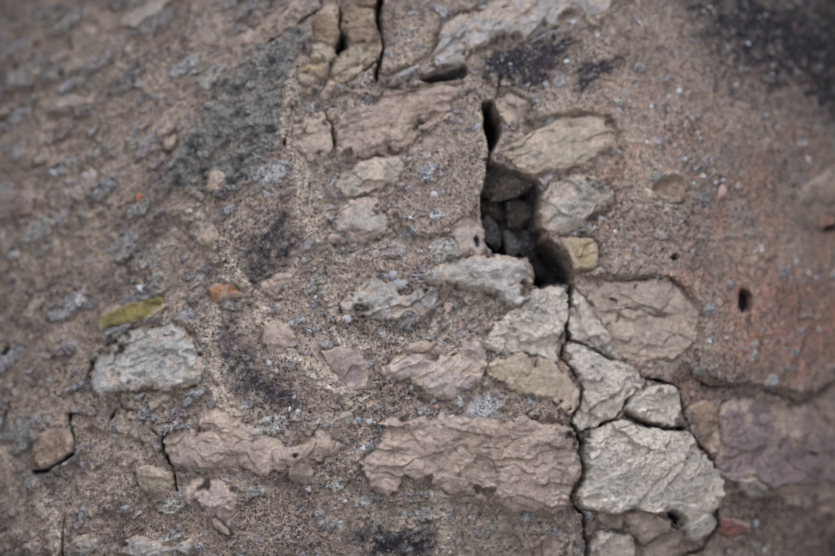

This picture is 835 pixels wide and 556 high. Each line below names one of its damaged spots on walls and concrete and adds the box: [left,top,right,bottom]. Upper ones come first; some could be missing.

crack [375,0,386,36]
crack [365,57,383,82]
crack [607,274,693,305]
crack [564,282,590,347]
crack [758,388,813,403]
crack [570,367,736,556]